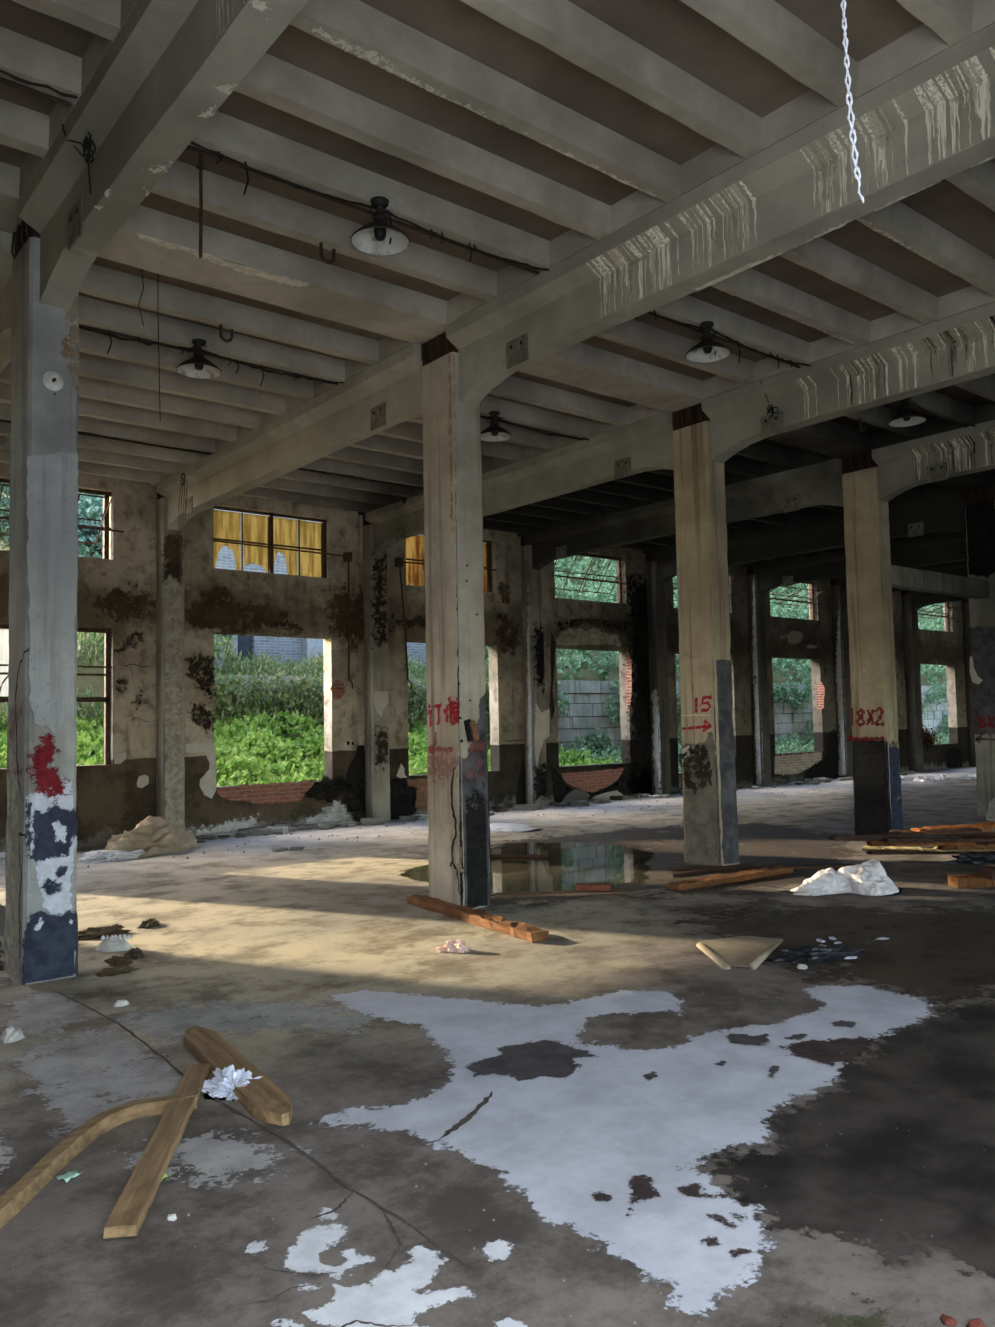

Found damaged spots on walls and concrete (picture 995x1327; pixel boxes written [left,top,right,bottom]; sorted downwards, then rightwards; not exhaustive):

peeling [249,0,272,21]
efflorescence [800,99,908,215]
efflorescence [914,47,995,165]
efflorescence [586,181,757,317]
water stain [184,585,308,638]
water stain [184,653,218,736]
flaking render [186,742,317,805]
peeling [516,627,632,804]
peeling [4,746,78,985]
crack [15,647,475,1271]
crack [240,1267,338,1305]
crack [341,1319,417,1327]